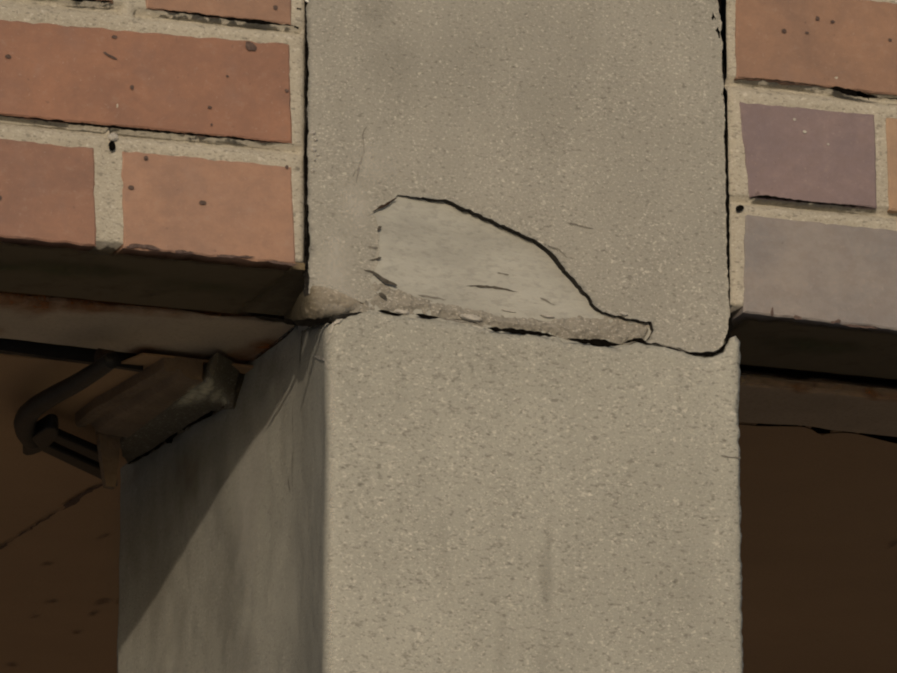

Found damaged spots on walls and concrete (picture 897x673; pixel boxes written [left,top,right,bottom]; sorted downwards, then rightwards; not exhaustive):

crack [256,0,897,368]
spalling [326,196,662,348]
crack [0,484,103,549]